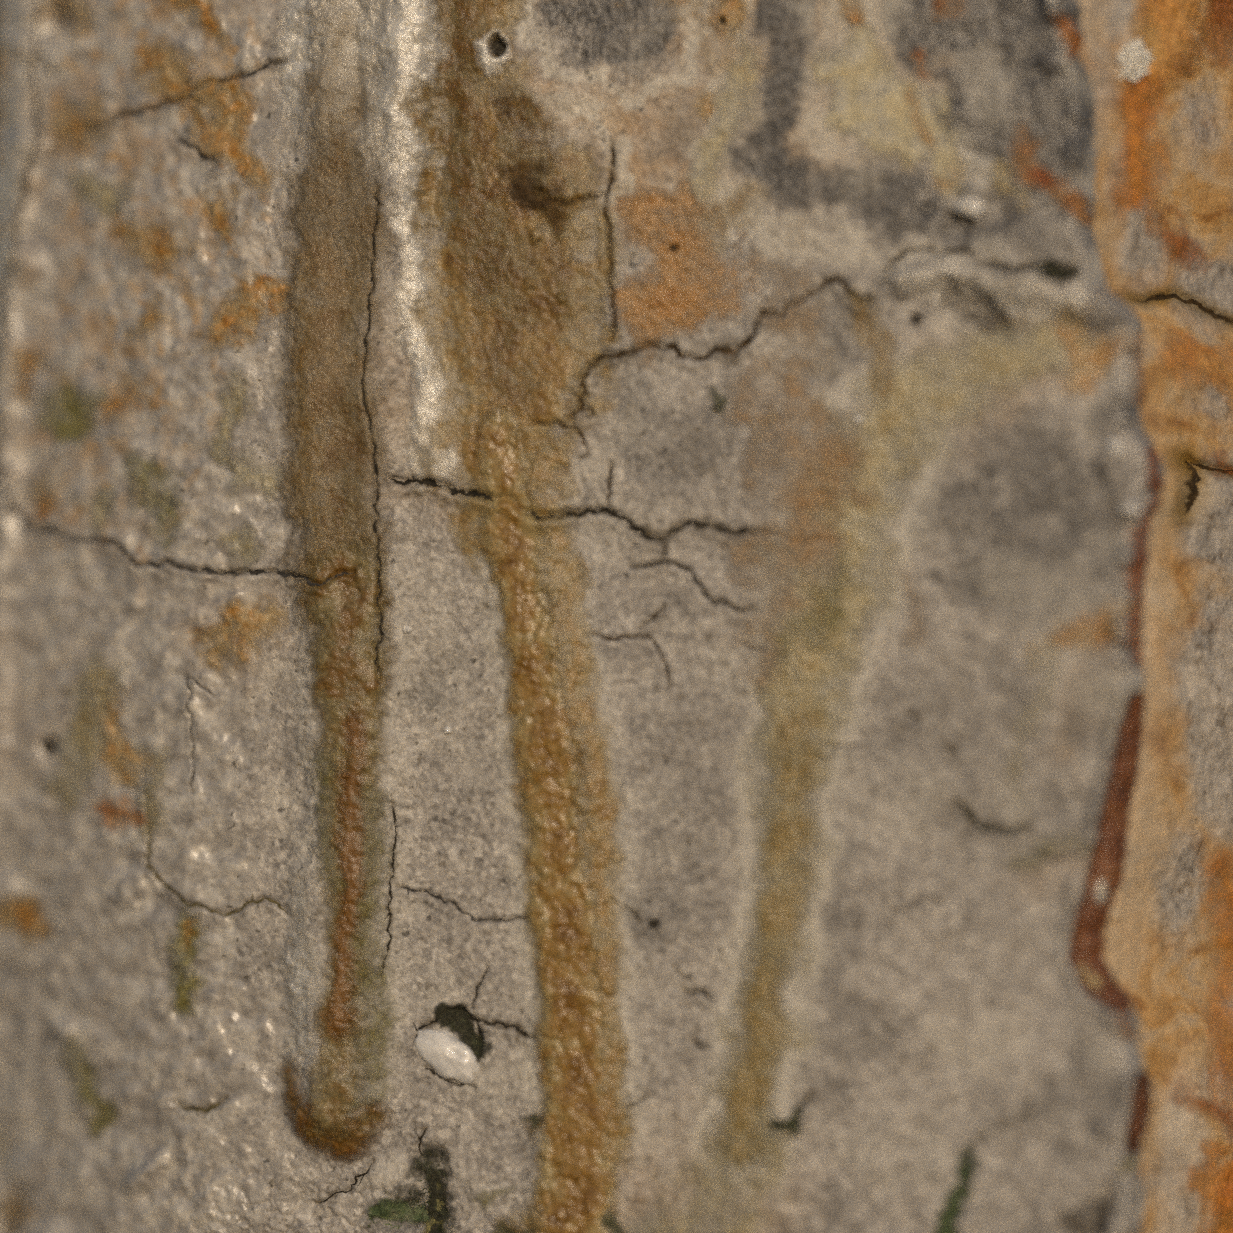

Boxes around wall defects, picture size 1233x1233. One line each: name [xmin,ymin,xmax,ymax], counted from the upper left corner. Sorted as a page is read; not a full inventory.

crack [94,61,285,129]
crack [176,136,216,164]
corrosion [136,42,271,187]
corrosion [208,274,290,346]
crack [0,144,1072,685]
corrosion [405,0,748,1233]
corrosion [1128,449,1164,664]
crack [381,807,528,974]
damp [643,322,1075,1233]
spalling [1069,693,1145,1010]
spalling [414,1029,480,1084]
spalling [1116,1071,1151,1175]